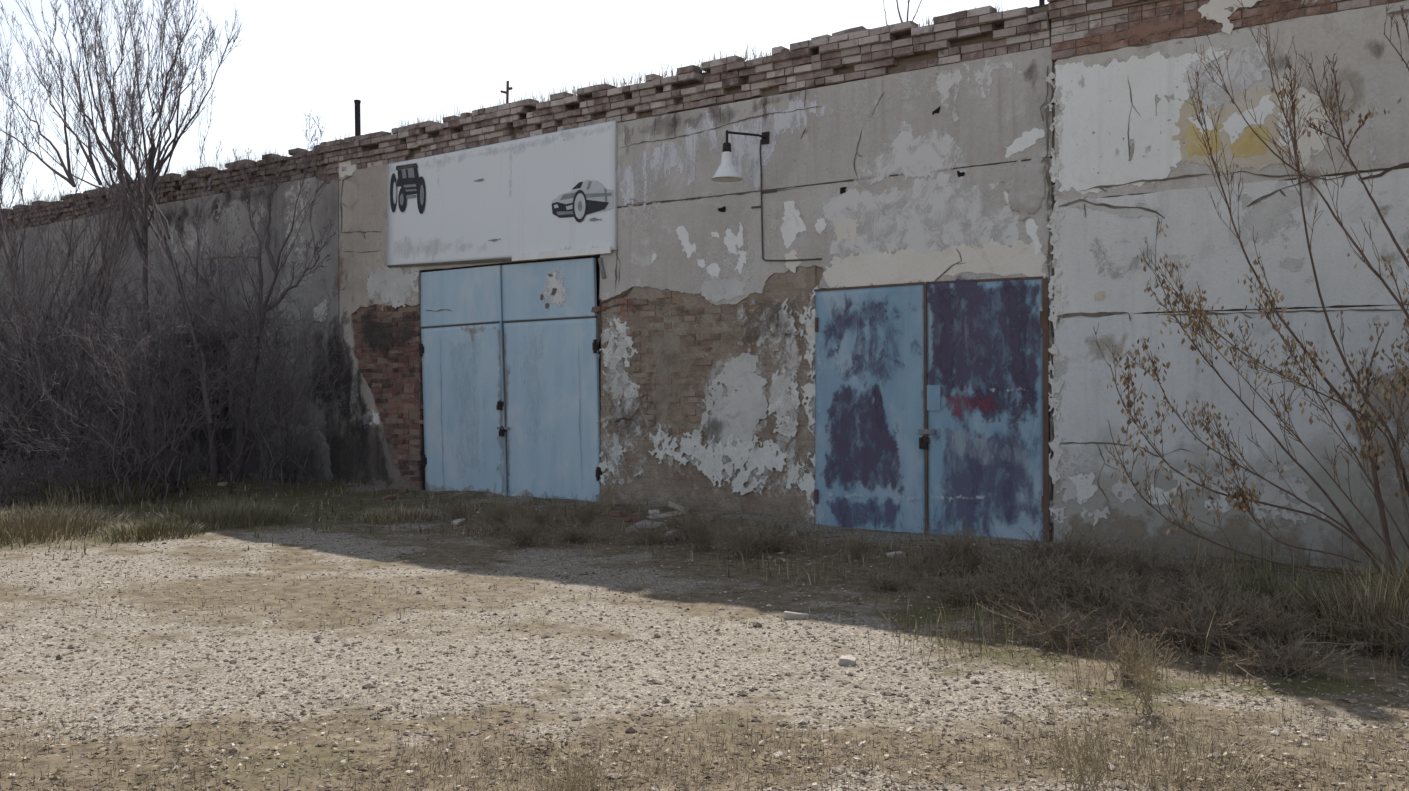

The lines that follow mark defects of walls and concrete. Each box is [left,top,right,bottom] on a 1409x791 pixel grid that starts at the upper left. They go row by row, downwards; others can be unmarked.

spalling [350,264,424,490]
peeling [541,270,568,311]
spalling [591,0,1356,535]
crack [1049,383,1219,516]
crack [1040,65,1409,348]